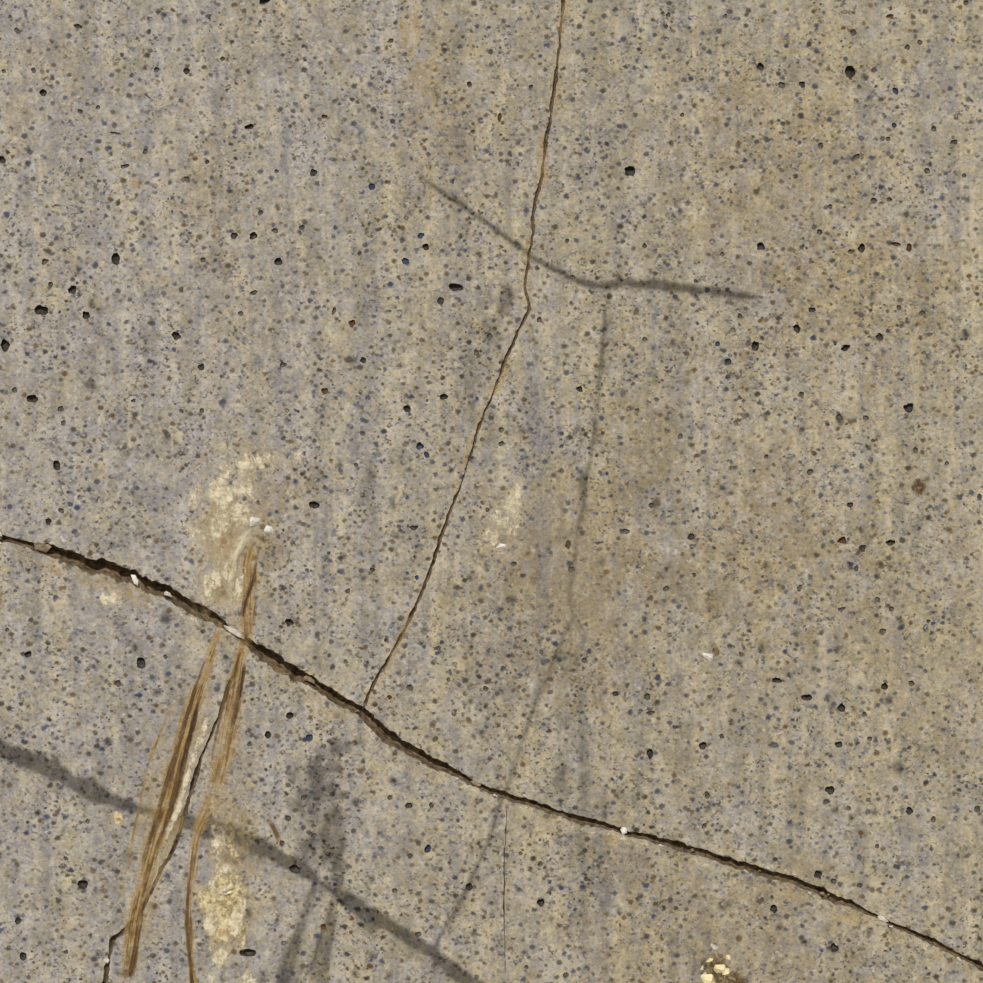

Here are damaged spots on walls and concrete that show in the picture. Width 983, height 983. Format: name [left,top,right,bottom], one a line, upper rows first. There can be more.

crack [362,0,565,710]
corrosion [121,626,221,979]
corrosion [184,501,260,983]
crack [0,532,983,983]